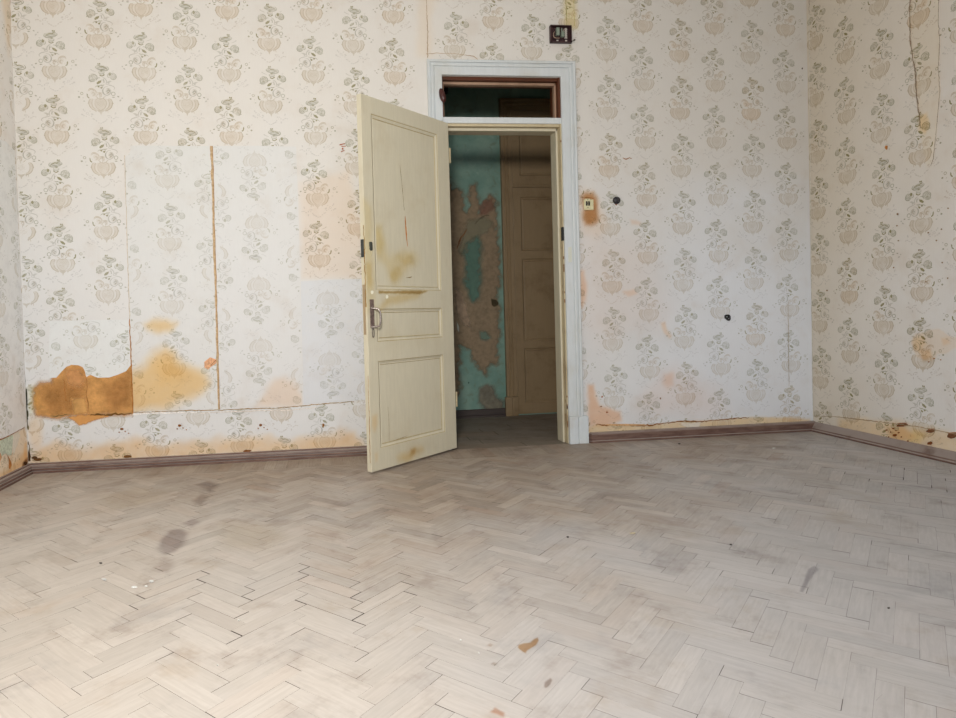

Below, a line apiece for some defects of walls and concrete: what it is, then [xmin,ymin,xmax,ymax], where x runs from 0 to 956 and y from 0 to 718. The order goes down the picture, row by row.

peeling [33,365,133,425]
peeling [450,184,501,398]